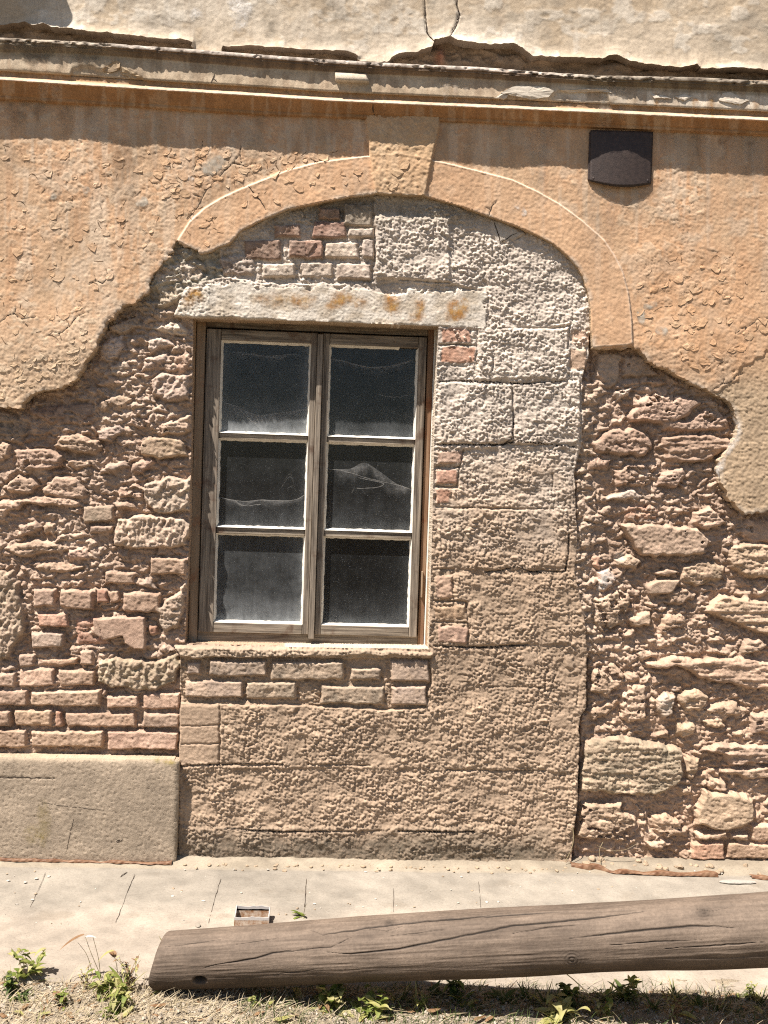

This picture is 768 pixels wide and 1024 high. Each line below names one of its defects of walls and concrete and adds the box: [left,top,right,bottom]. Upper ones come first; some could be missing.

spalling [0,26,192,49]
spalling [223,50,357,61]
crack [424,0,460,42]
spalling [391,43,768,80]
peeling [635,263,768,370]
spalling [0,195,434,756]
spalling [572,345,768,861]